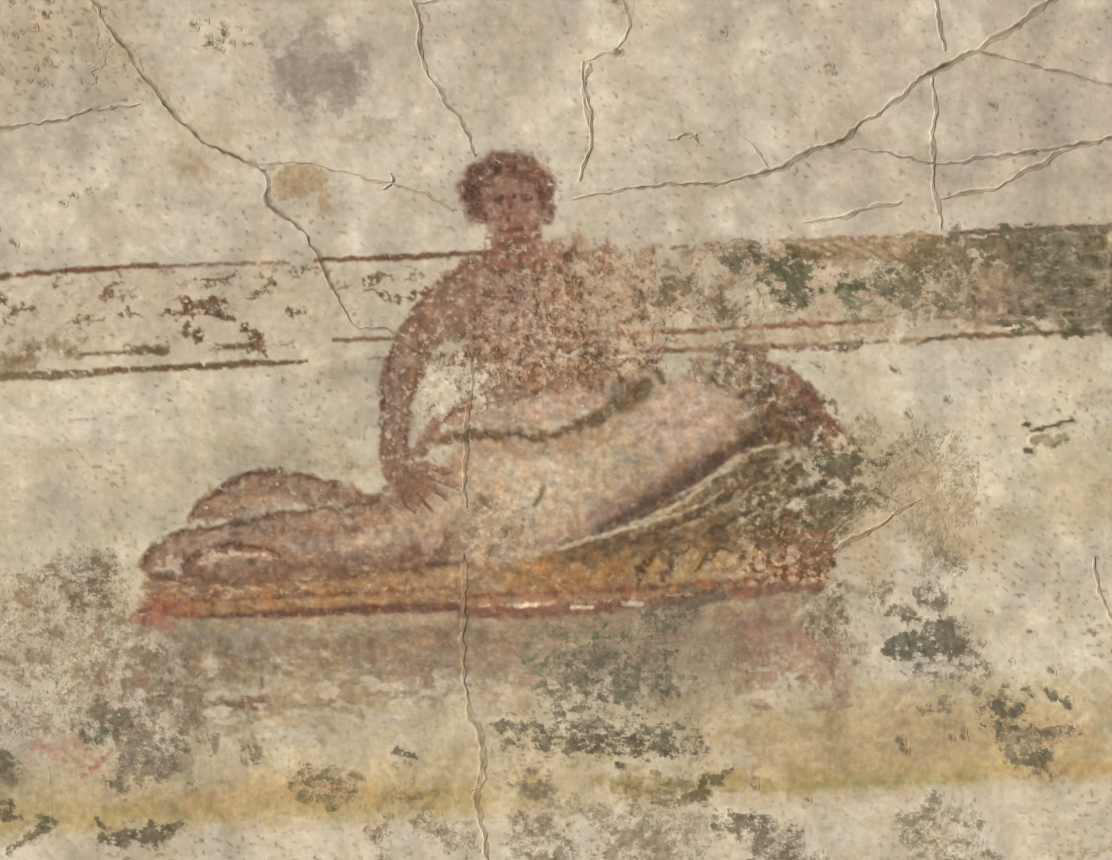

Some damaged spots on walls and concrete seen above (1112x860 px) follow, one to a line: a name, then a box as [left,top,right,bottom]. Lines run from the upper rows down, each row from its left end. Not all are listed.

crack [0,0,455,354]
damp [239,12,399,162]
crack [410,0,477,156]
crack [572,0,1112,229]
crack [461,346,476,508]
crack [457,553,489,860]
damp [0,751,52,828]